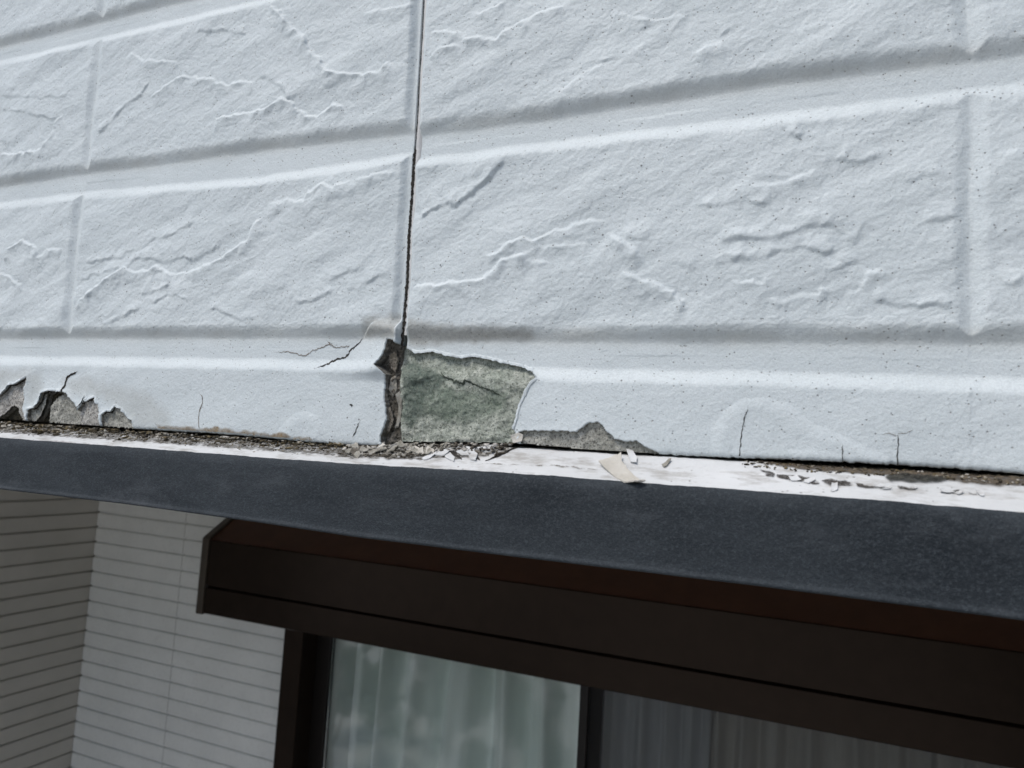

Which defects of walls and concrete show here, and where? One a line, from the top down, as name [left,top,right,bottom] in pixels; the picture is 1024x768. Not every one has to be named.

crack [401,2,424,348]
crack [278,339,362,368]
peeling [0,372,134,429]
peeling [382,341,671,467]
peeling [761,470,918,492]